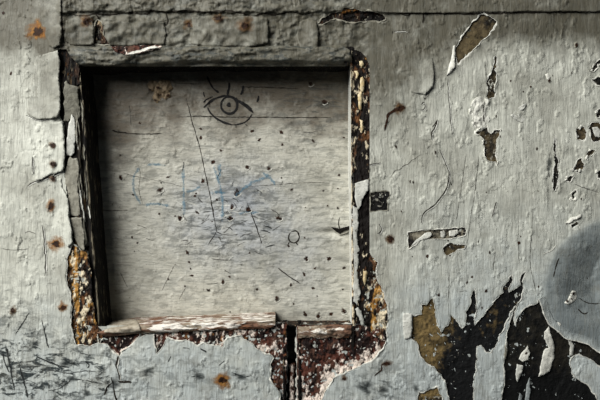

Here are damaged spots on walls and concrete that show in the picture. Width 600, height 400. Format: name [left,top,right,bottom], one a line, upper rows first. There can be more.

rust [28,20,45,39]
peeling [447,12,497,75]
rust [384,103,405,131]
peeling [469,55,502,166]
peeling [552,108,600,201]
peeling [341,180,390,322]
peeling [407,227,467,256]
rust [48,238,391,400]
peeling [403,271,600,400]